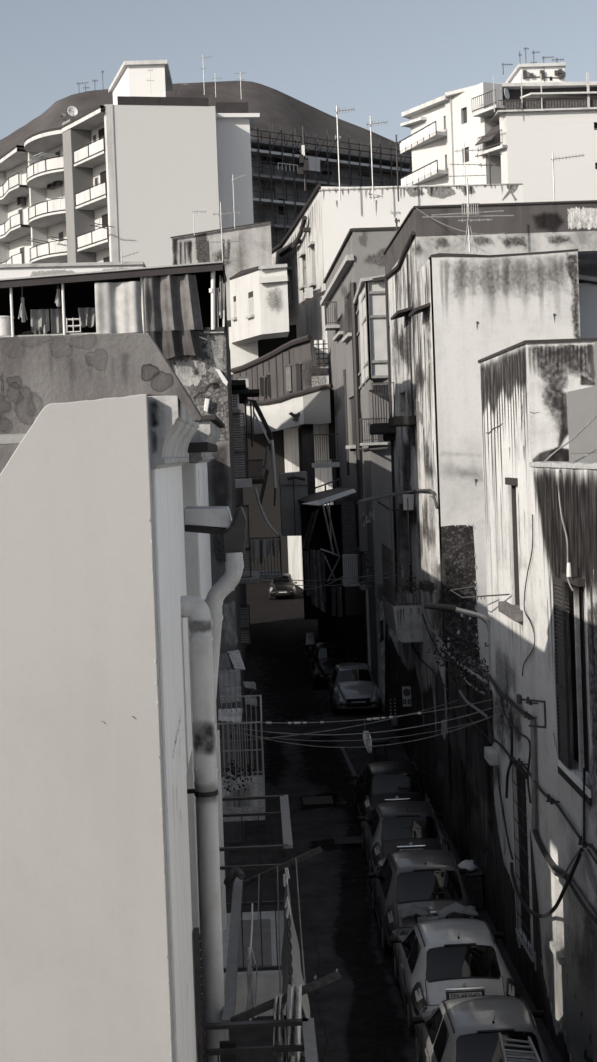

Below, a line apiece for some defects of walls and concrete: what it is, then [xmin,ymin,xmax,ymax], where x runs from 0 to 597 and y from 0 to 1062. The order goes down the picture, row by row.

damp [141,364,173,450]
flaking render [175,359,206,386]
peeling [384,523,480,843]
damp [481,345,597,821]